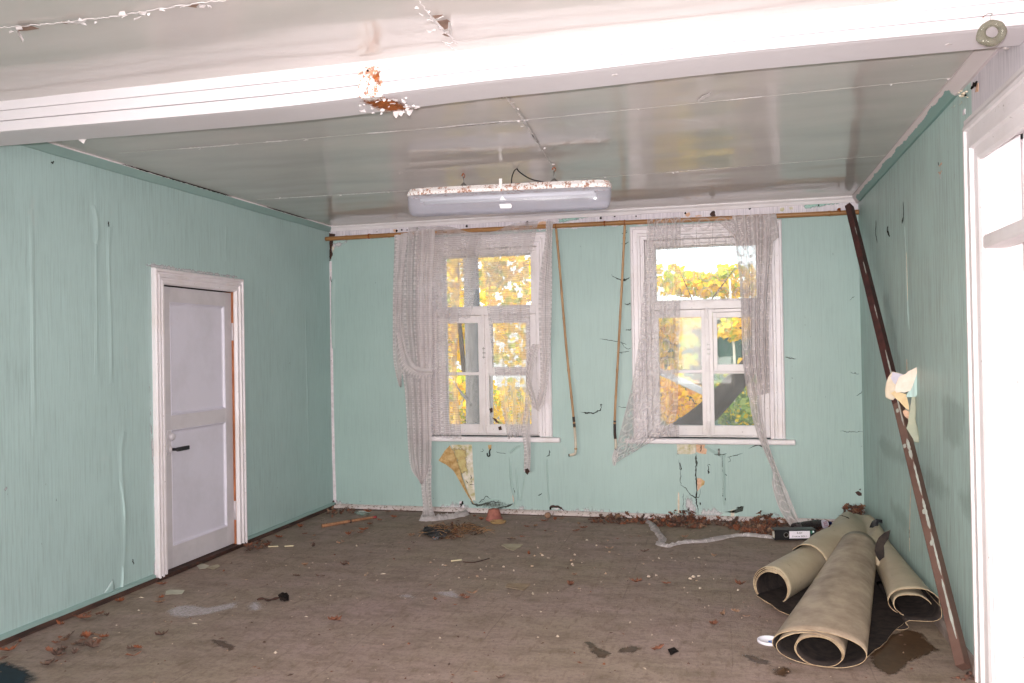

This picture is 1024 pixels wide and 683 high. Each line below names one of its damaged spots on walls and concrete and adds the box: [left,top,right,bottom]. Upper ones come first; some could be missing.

peeling [359,97,420,118]
flaking render [438,444,475,508]
crack [679,454,739,509]
leakage [871,630,939,674]